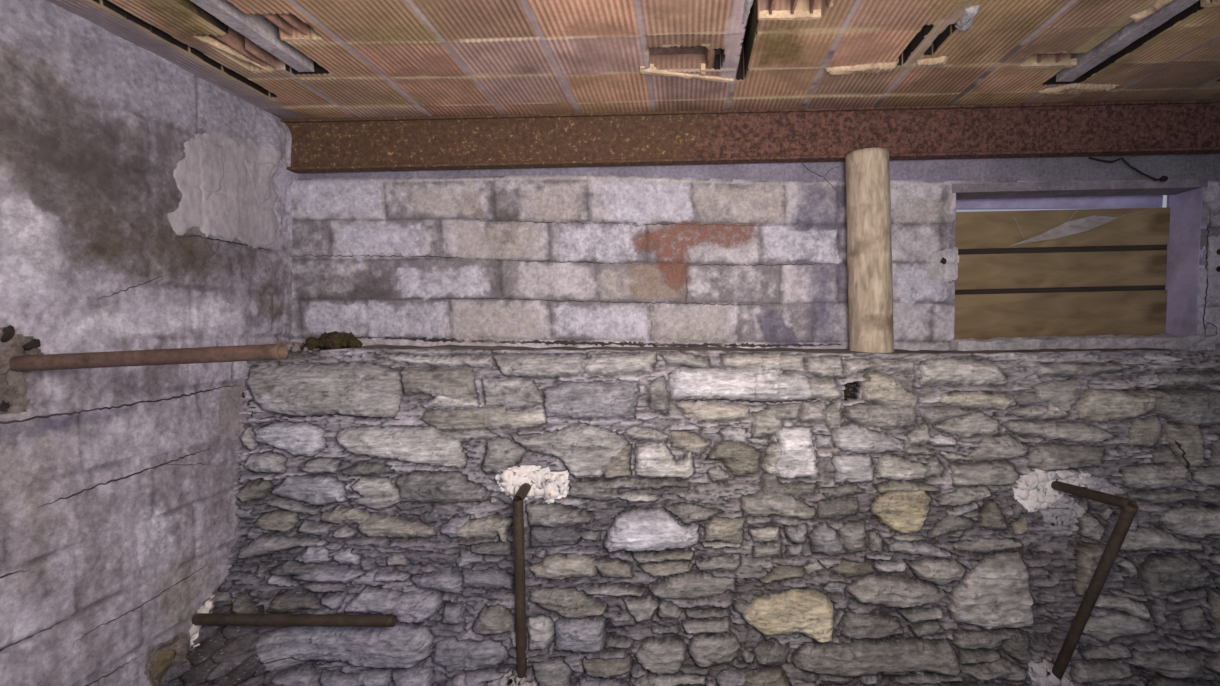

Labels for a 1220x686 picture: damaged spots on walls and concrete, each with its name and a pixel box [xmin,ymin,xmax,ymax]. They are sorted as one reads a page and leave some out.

peeling [0,0,283,249]
rust [631,222,754,298]
crack [0,384,395,424]
crack [38,449,209,508]
crack [0,564,208,652]
crack [85,656,140,686]